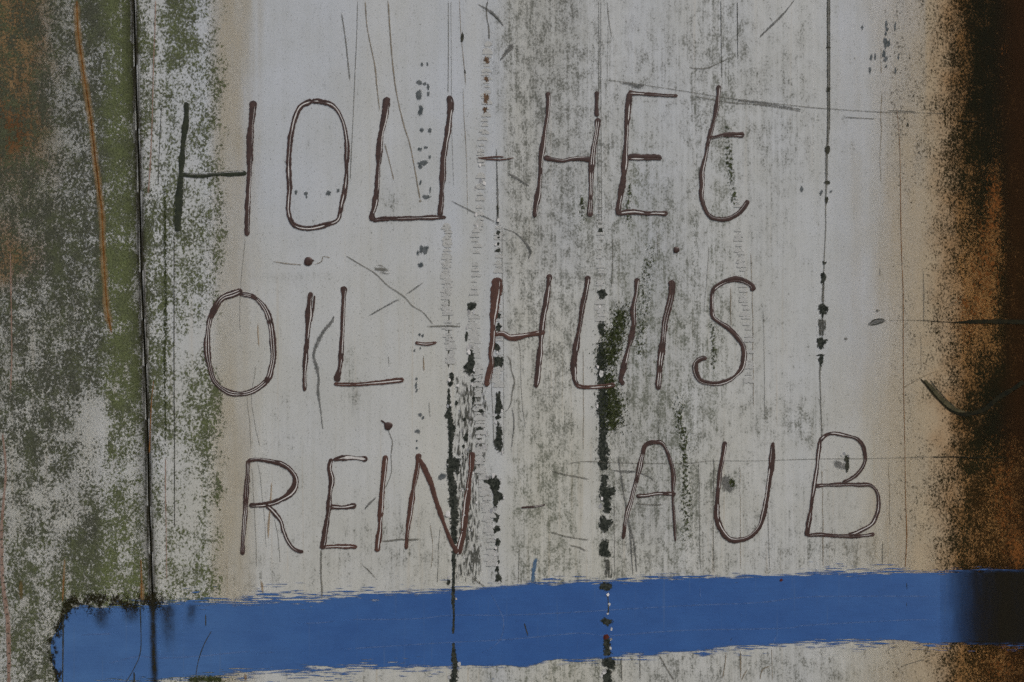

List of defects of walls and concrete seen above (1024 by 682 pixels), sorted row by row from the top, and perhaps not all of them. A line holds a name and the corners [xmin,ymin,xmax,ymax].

rust [75,1,112,332]
damp [149,167,175,578]
crack [816,0,831,436]
rust [883,0,1024,577]
rust [892,640,1024,682]